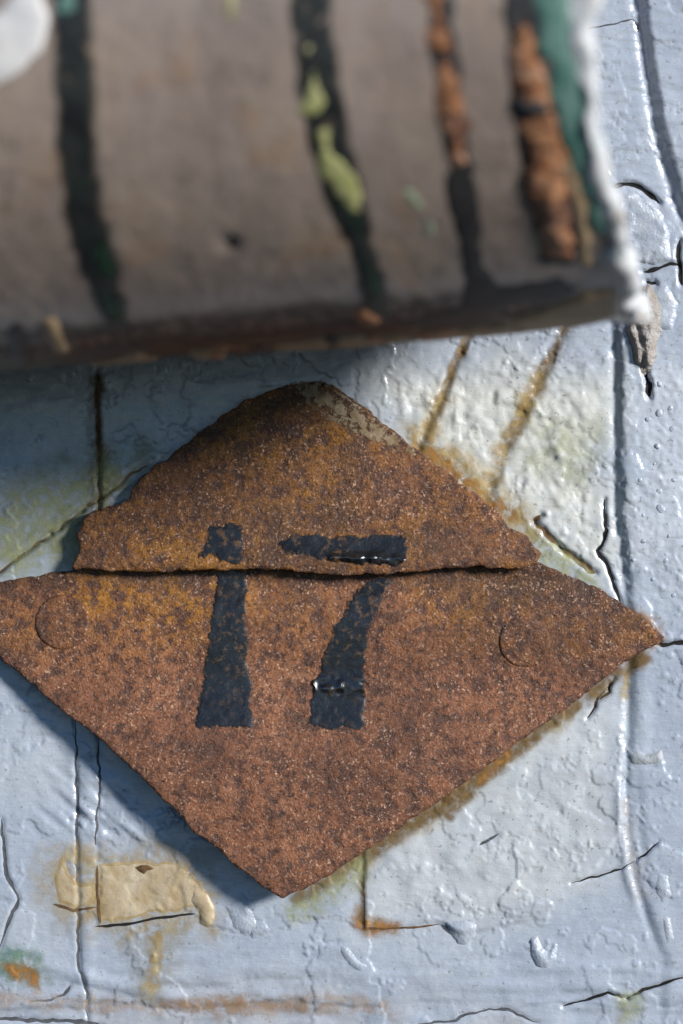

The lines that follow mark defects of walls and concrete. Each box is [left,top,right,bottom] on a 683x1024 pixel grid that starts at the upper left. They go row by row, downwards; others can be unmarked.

crack [615,182,659,203]
crack [644,240,683,285]
crack [0,374,147,574]
rust [87,352,160,511]
rust [410,287,617,542]
crack [534,499,621,602]
rust [292,652,650,935]
crack [0,724,101,1024]
rust [51,849,126,923]
crack [573,842,659,883]
crack [563,977,683,1007]